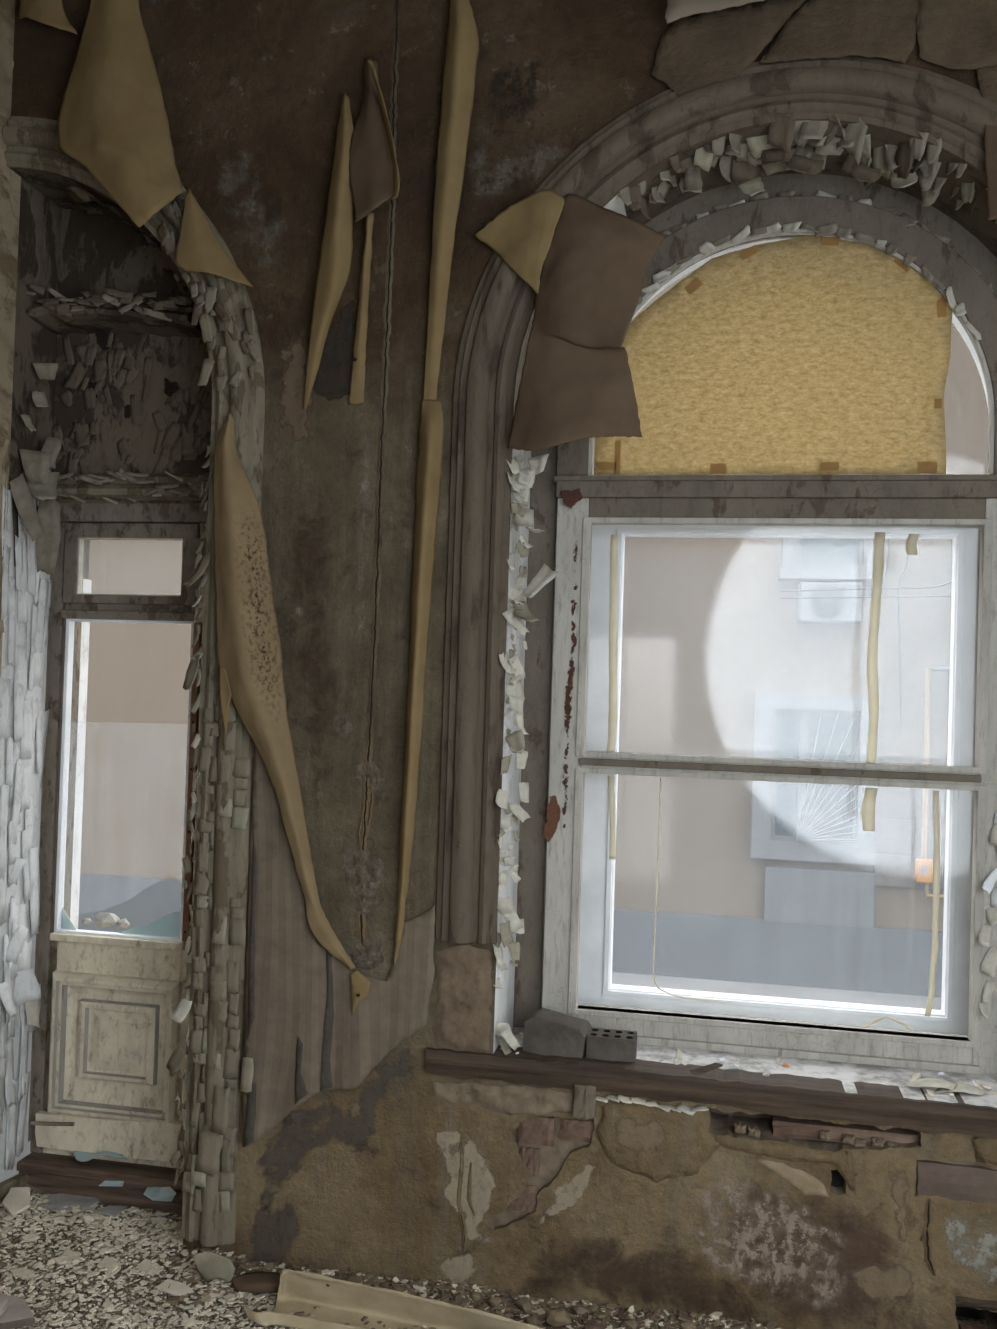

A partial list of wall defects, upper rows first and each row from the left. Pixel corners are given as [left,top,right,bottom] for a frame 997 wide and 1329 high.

peeling [619,113,978,252]
peeling [637,221,982,340]
peeling [279,300,355,441]
peeling [0,181,261,1212]
peeling [493,454,560,989]
flaking render [251,1048,411,1265]
flaking render [436,1130,496,1284]
flaking render [433,1082,575,1116]
peeling [496,1023,521,1055]
water stain [531,1190,908,1324]
flaking render [753,1158,844,1197]
spalling [711,1108,919,1147]